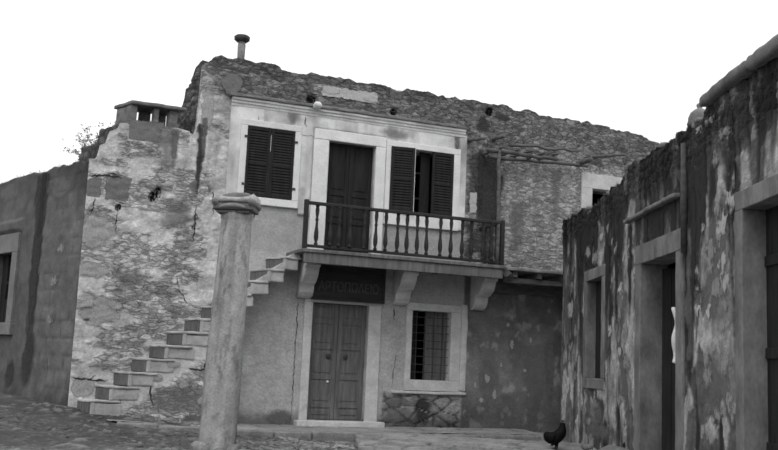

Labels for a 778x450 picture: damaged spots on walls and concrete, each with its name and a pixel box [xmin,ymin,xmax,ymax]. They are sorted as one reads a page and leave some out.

leakage [5,173,73,386]
crack [192,192,214,241]
crack [290,300,298,419]
peeling [561,246,579,384]
leakage [575,194,632,323]
peeling [585,224,631,409]
leakage [643,195,676,243]
leakage [686,130,707,331]
peeling [695,171,735,335]
peeling [711,127,732,165]
leakage [720,104,735,219]